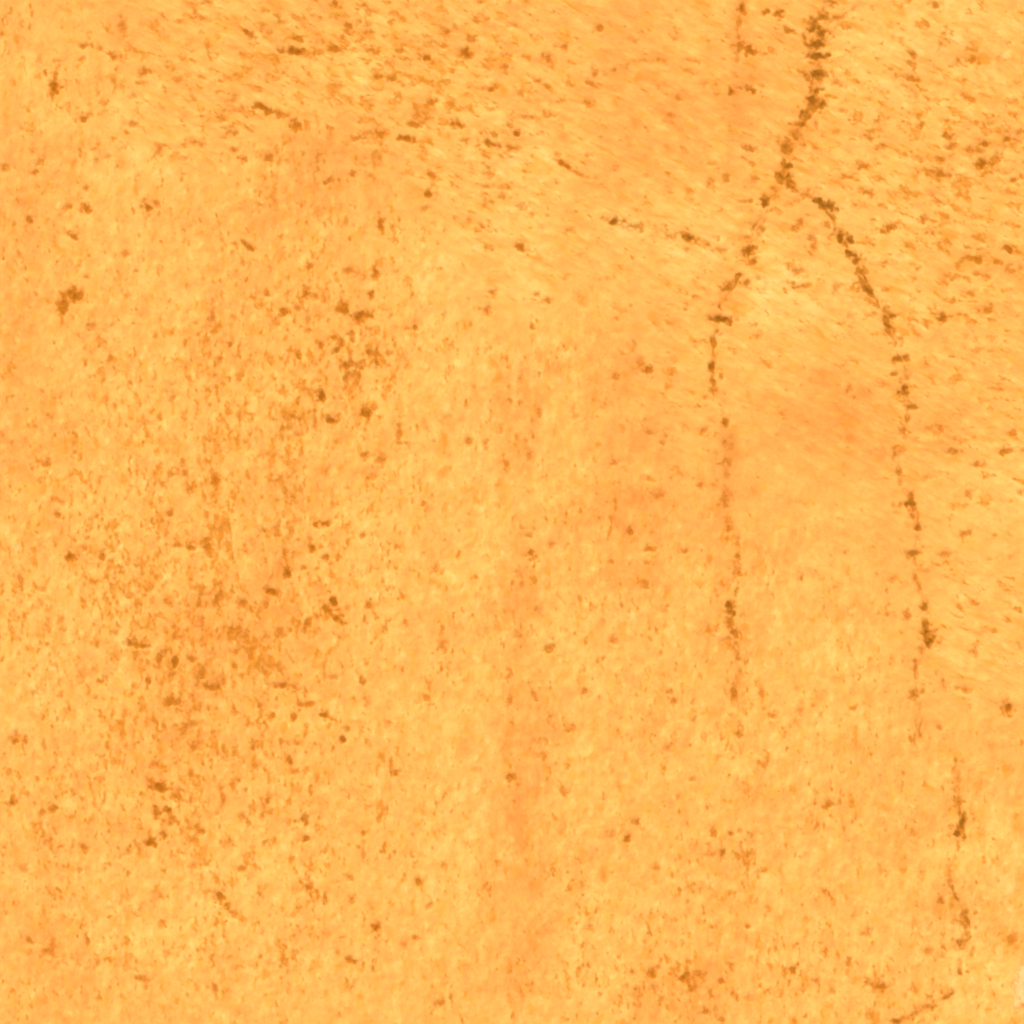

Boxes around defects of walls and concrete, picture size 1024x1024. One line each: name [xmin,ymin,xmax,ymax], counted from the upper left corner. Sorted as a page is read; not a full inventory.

crack [708,0,936,697]